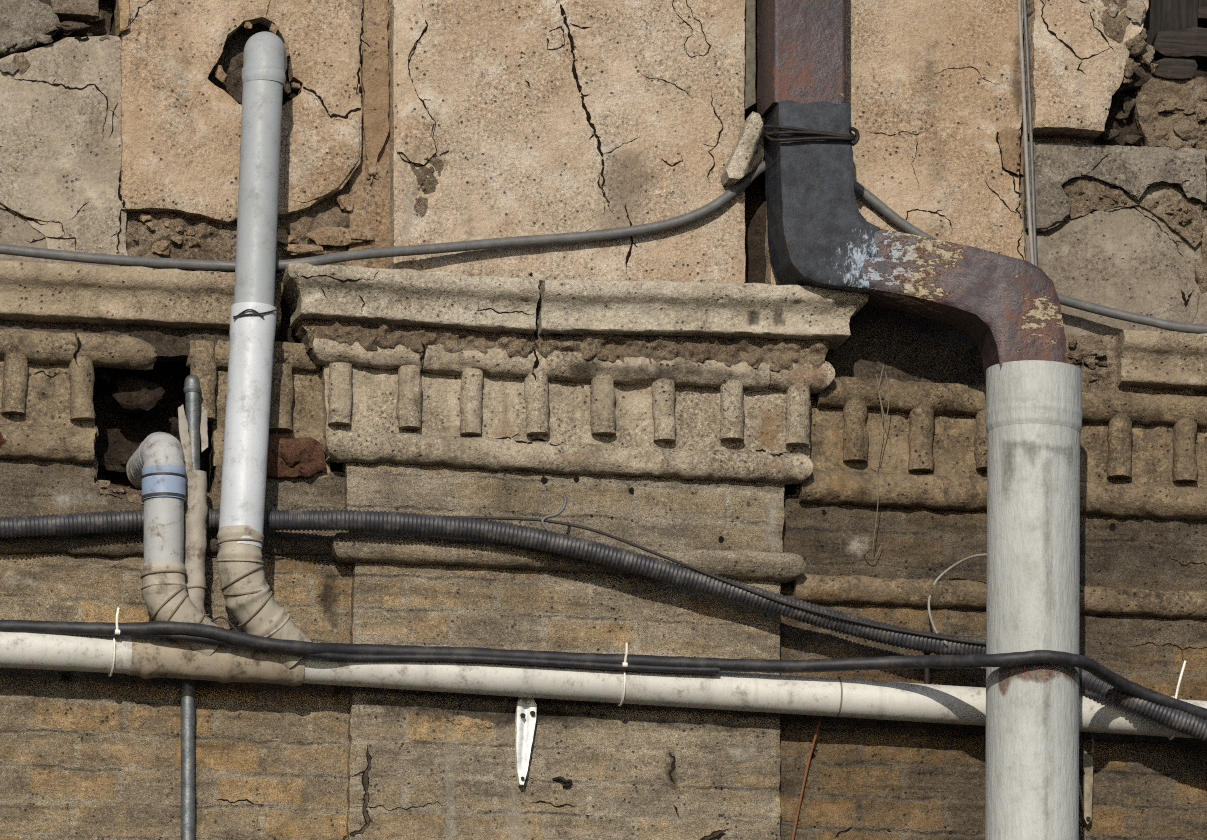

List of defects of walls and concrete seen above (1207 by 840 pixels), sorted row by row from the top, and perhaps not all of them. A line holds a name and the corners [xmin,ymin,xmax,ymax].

crack [0,0,152,139]
crack [303,1,370,121]
crack [399,5,437,167]
crack [547,0,639,273]
crack [643,75,723,186]
spalling [1092,0,1207,150]
peeling [0,170,58,222]
spalling [125,211,237,272]
spalling [276,159,379,265]
spalling [1062,177,1207,293]
spalling [91,457,144,504]
crack [342,745,445,840]